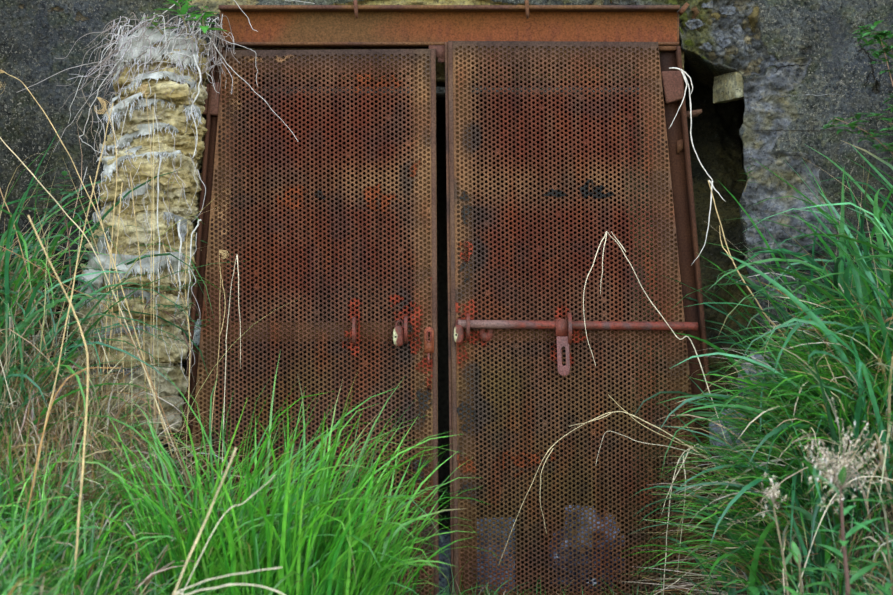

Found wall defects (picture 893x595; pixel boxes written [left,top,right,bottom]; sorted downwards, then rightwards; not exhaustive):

corrosion [353,74,402,95]
spalling [586,0,833,306]
corrosion [275,186,306,209]
corrosion [362,184,395,215]
corrosion [216,179,231,256]